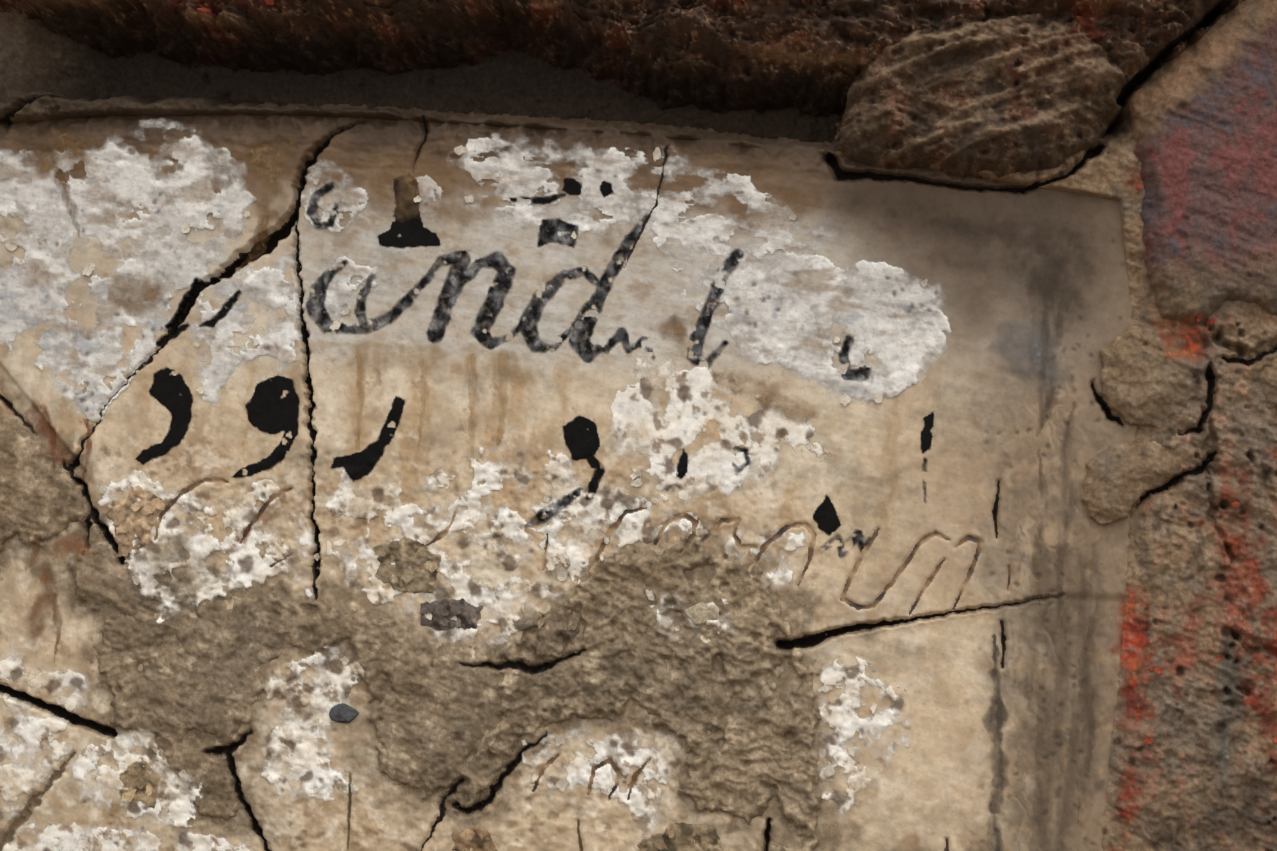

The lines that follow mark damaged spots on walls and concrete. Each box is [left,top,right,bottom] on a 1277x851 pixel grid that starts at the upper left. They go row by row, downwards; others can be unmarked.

crack [413,115,429,172]
peeling [0,118,303,422]
peeling [454,134,951,406]
crack [63,122,366,600]
peeling [1162,313,1215,358]
crack [992,480,1000,539]
crack [776,594,1063,668]
crack [0,684,118,851]
peeling [261,646,364,801]
spalling [451,826,498,851]
peeling [520,730,724,851]
crack [763,818,771,851]